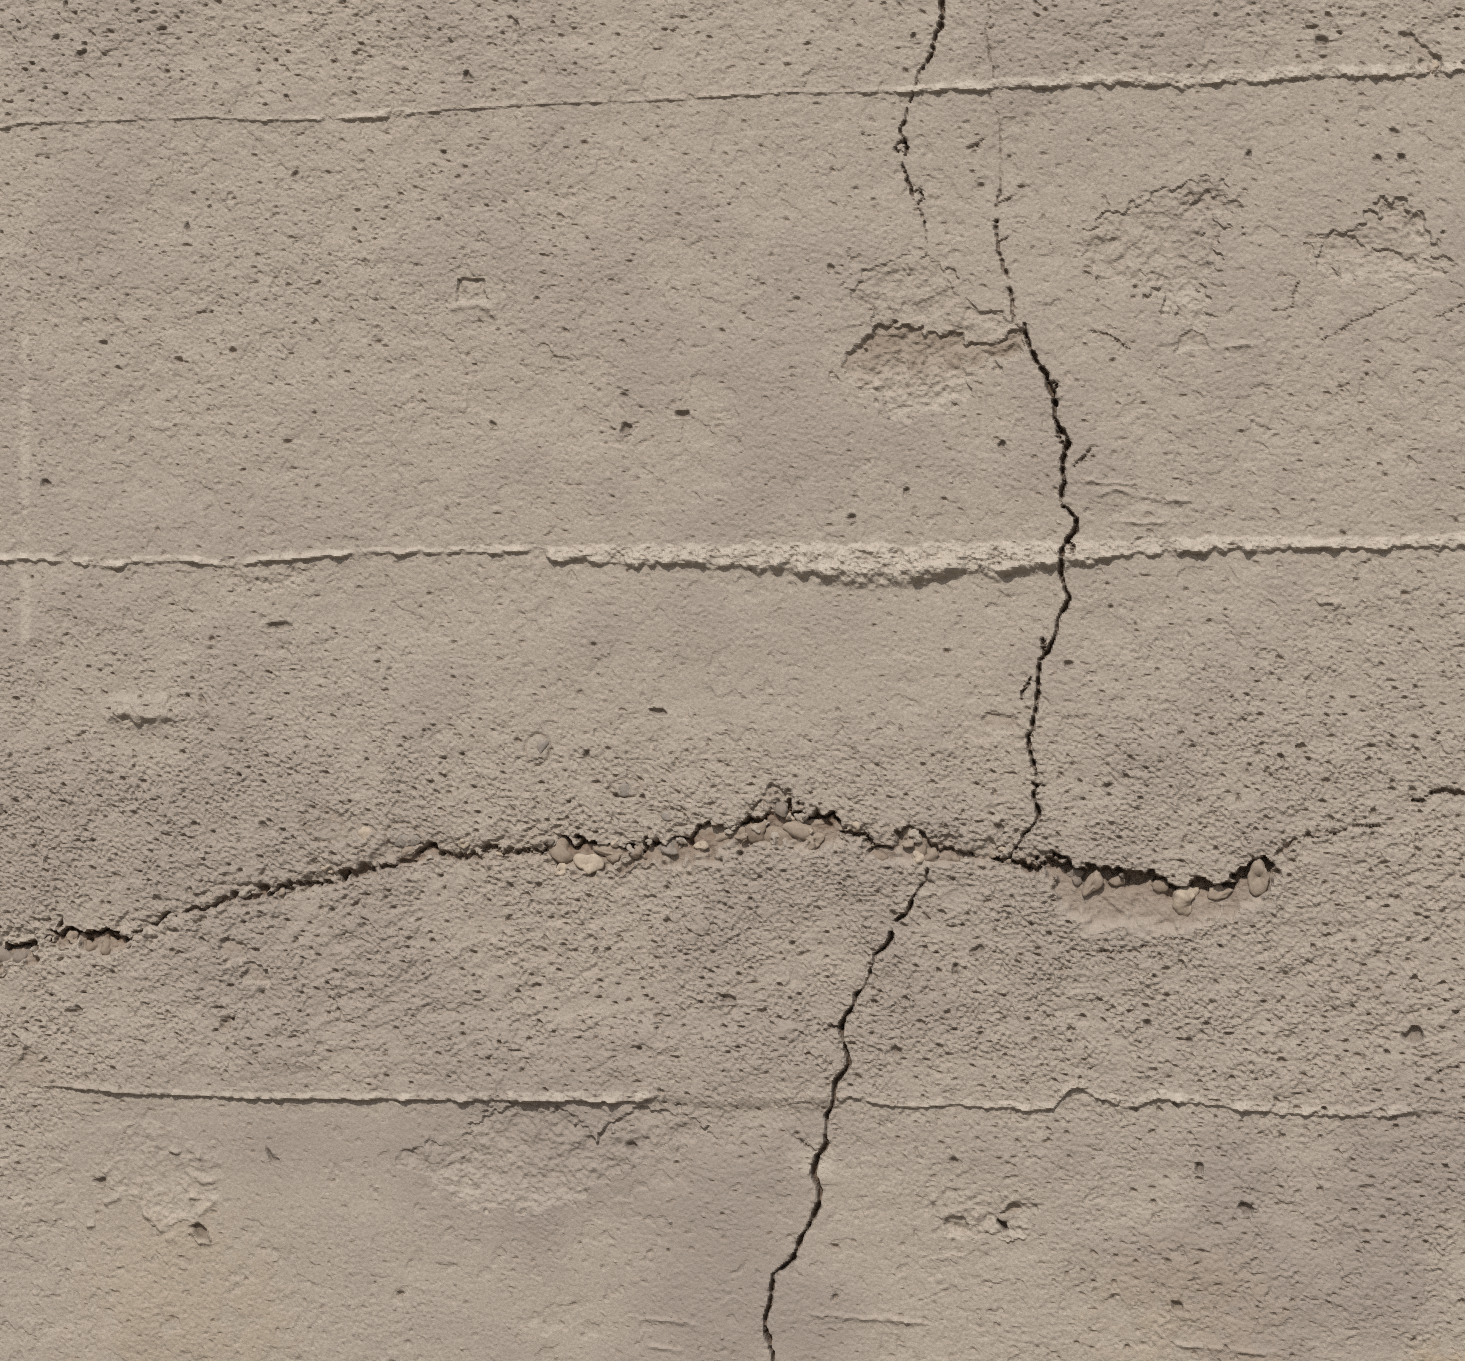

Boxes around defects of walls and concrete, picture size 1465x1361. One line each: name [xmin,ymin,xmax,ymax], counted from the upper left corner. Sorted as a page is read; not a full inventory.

crack [1271,280,1303,315]
crack [1321,288,1465,343]
crack [1090,329,1133,352]
crack [0,0,1093,1361]
crack [1411,787,1465,806]
crack [1274,807,1383,858]
crack [1071,937,1181,958]
crack [1435,1061,1465,1077]